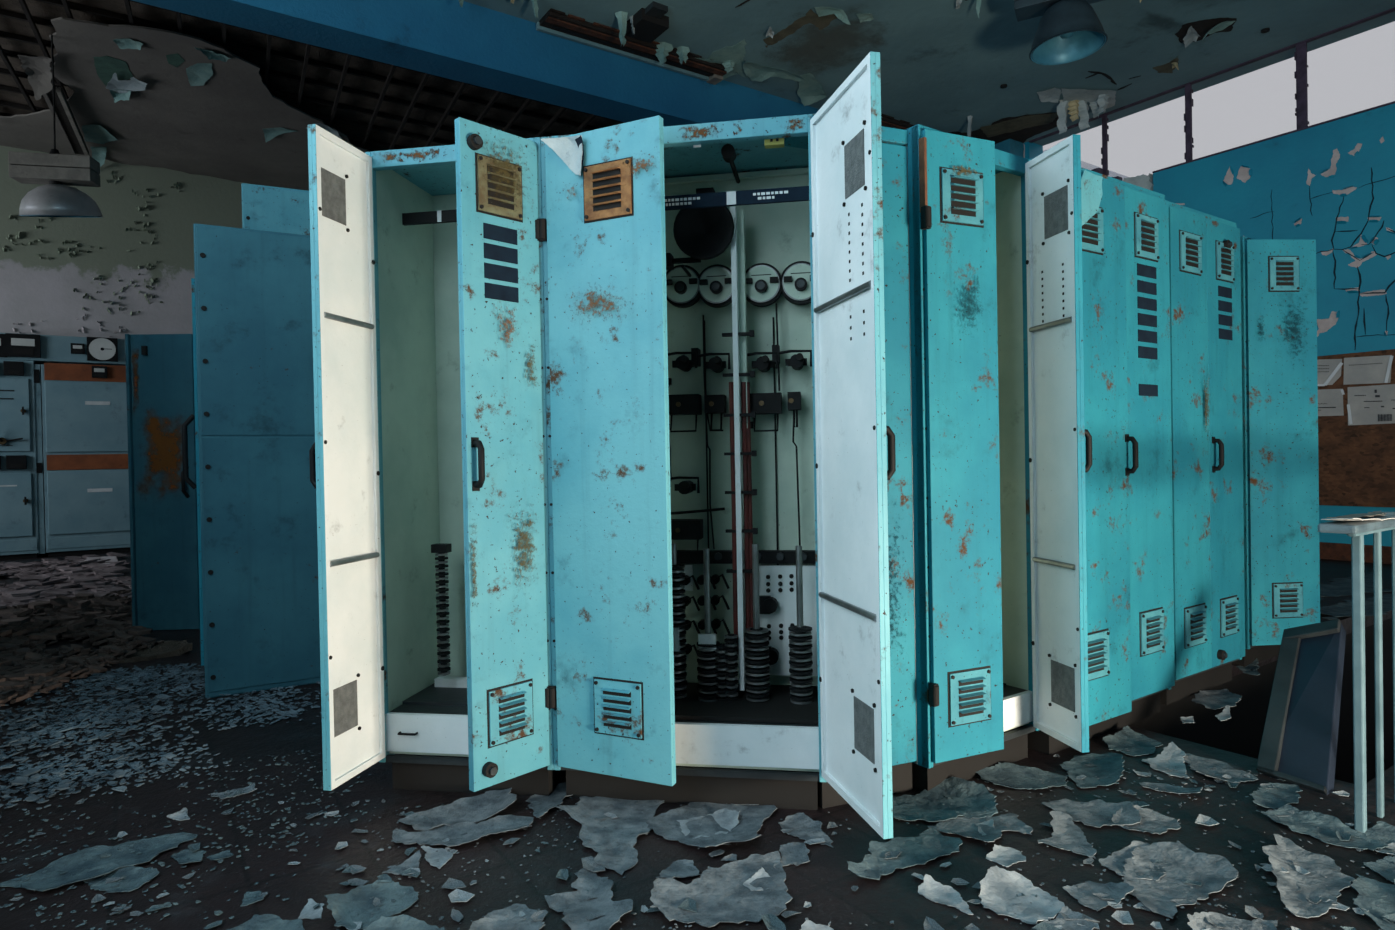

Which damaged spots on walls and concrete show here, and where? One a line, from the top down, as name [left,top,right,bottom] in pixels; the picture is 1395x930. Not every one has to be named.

peeling [18,55,53,100]
peeling [93,39,147,103]
peeling [697,39,827,106]
peeling [764,7,874,48]
peeling [1153,18,1237,73]
peeling [262,123,342,142]
peeling [1223,165,1252,186]
peeling [1306,143,1362,197]
peeling [73,125,179,337]
crack [1309,167,1395,349]
peeling [1321,216,1395,268]
peeling [1317,311,1340,337]